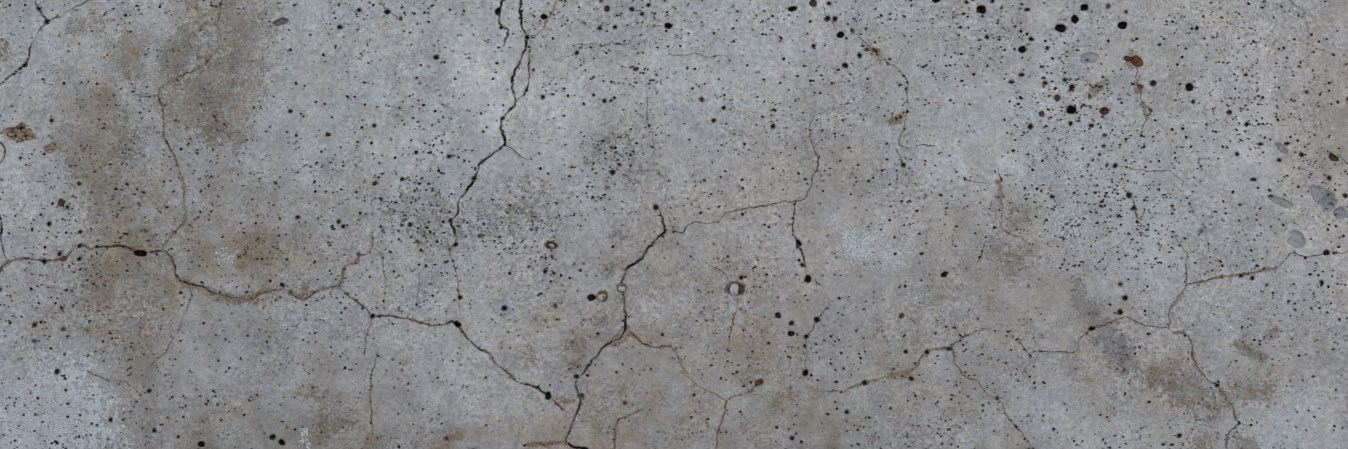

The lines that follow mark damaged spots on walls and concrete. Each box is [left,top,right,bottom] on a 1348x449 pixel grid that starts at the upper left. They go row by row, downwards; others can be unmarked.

crack [1135,67,1151,129]
crack [0,0,1032,449]
crack [1108,166,1188,251]
crack [1017,236,1348,448]